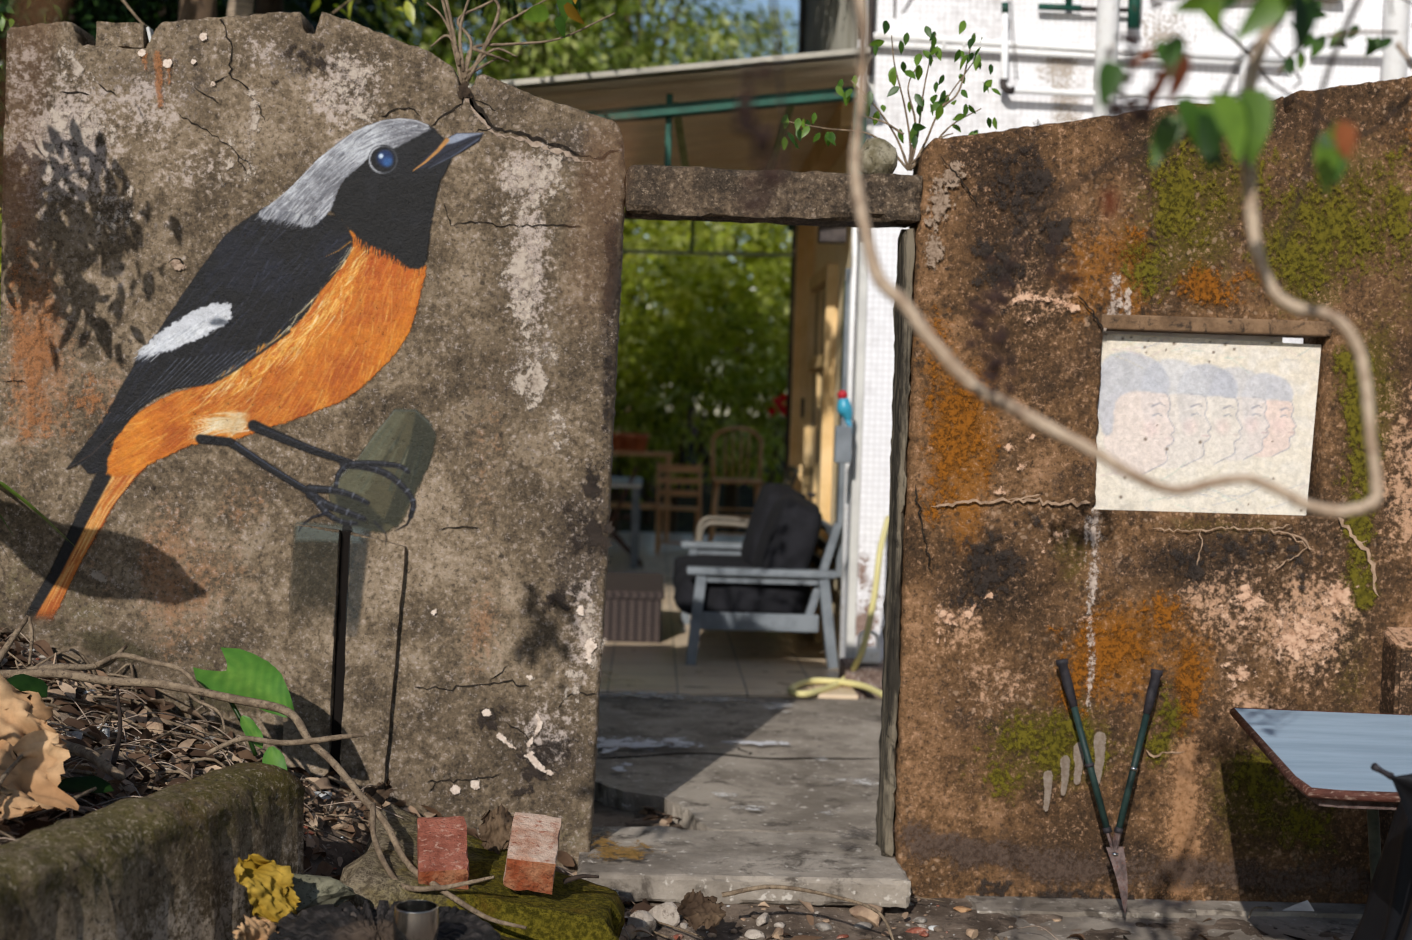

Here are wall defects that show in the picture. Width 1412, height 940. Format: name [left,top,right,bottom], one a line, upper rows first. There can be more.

crack [179,19,265,173]
crack [383,92,620,165]
rust [918,307,1001,528]
crack [914,485,1090,574]
crack [1153,524,1313,569]
crack [1339,517,1379,596]
peeling [583,637,597,664]
water stain [1084,508,1101,706]
rust [1046,589,1194,719]
rust [1174,643,1210,739]
spalling [496,714,553,776]
water stain [893,736,1371,901]